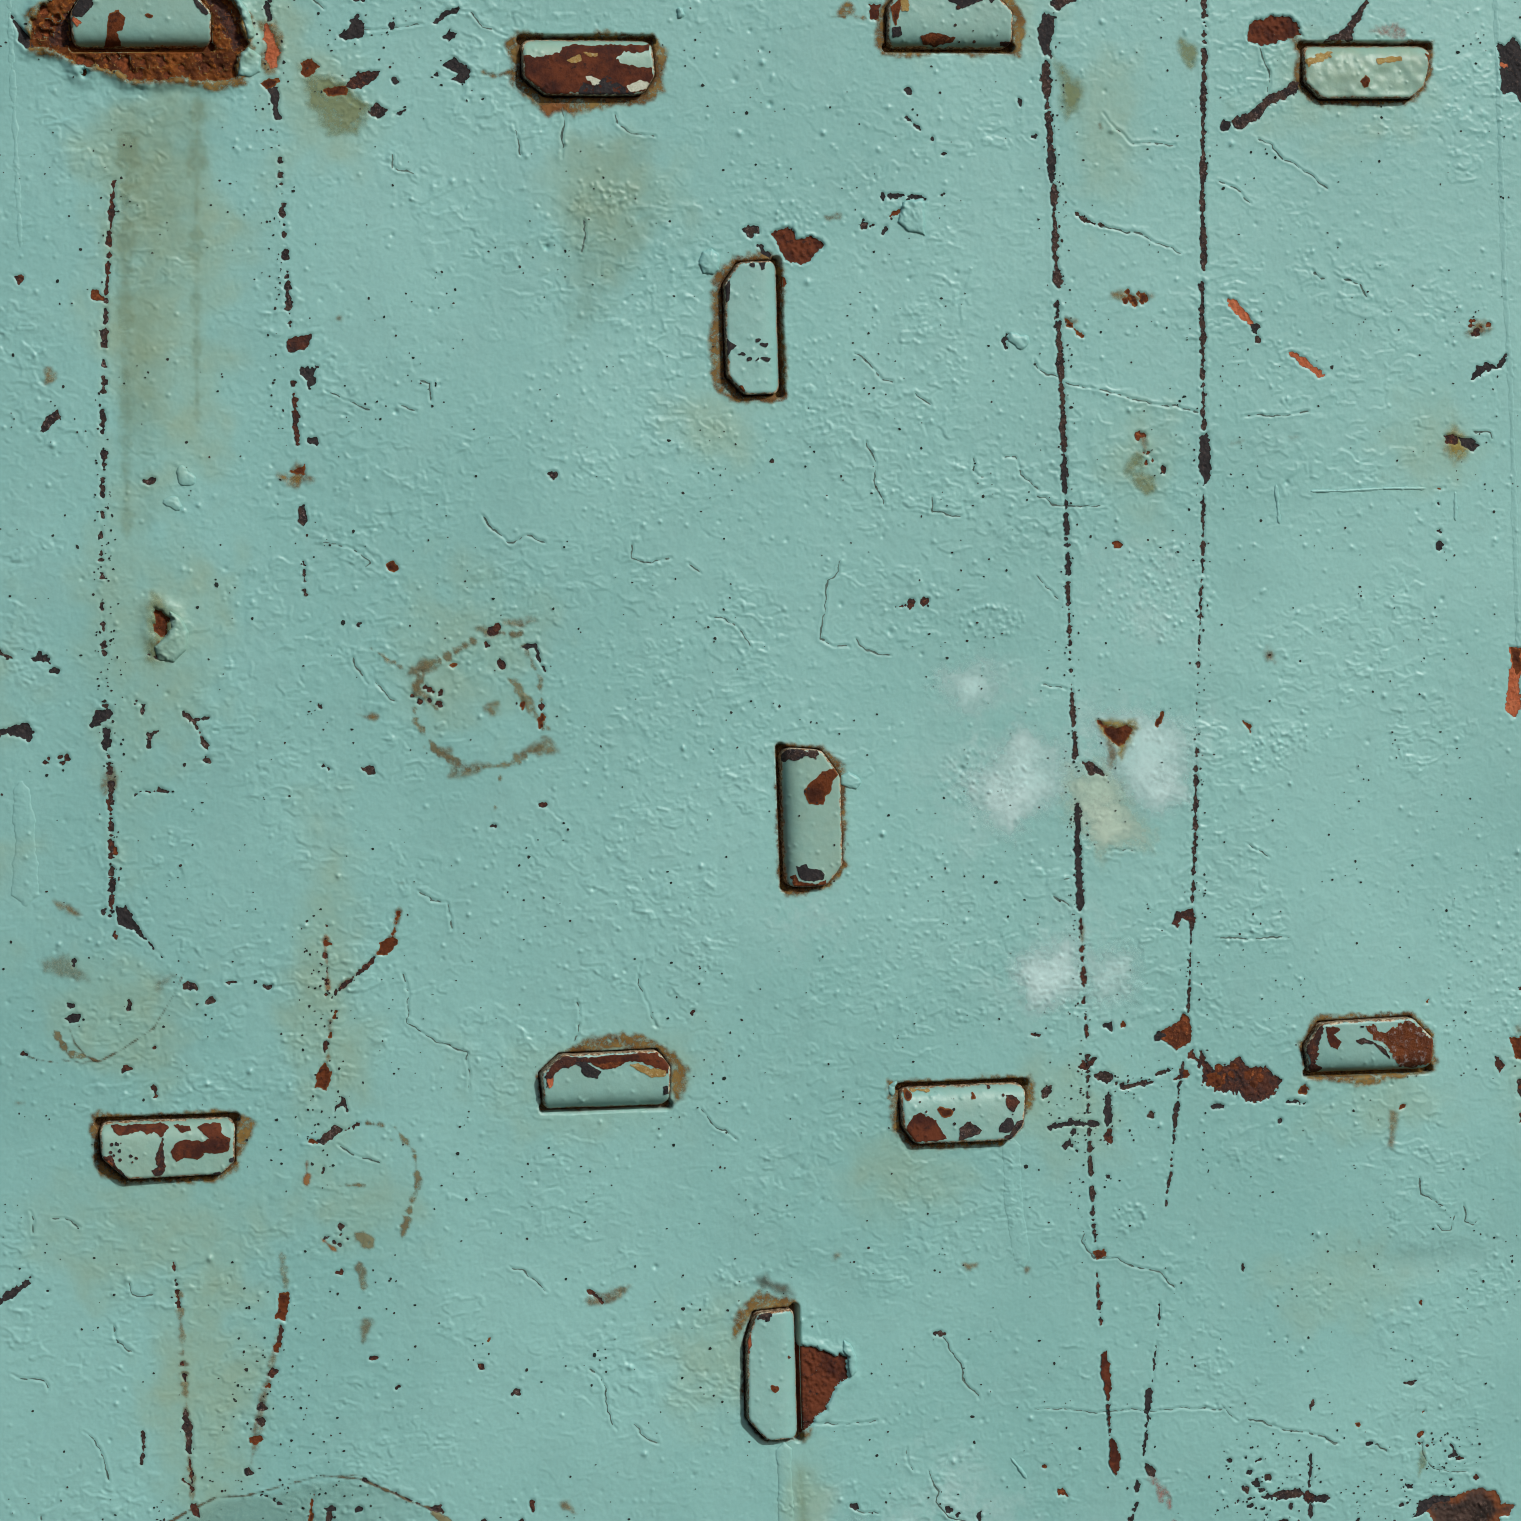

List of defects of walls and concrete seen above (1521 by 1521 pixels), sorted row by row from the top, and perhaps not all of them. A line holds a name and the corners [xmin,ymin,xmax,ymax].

corrosion [25,0,283,91]
corrosion [1061,70,1081,113]
corrosion [1179,39,1196,67]
corrosion [1247,15,1433,106]
peeling [1456,2,1521,102]
corrosion [280,465,311,487]
corrosion [1129,437,1154,494]
corrosion [1505,647,1521,717]
peeling [307,701,376,775]
peeling [1005,615,1305,1263]
corrosion [1415,1487,1515,1521]